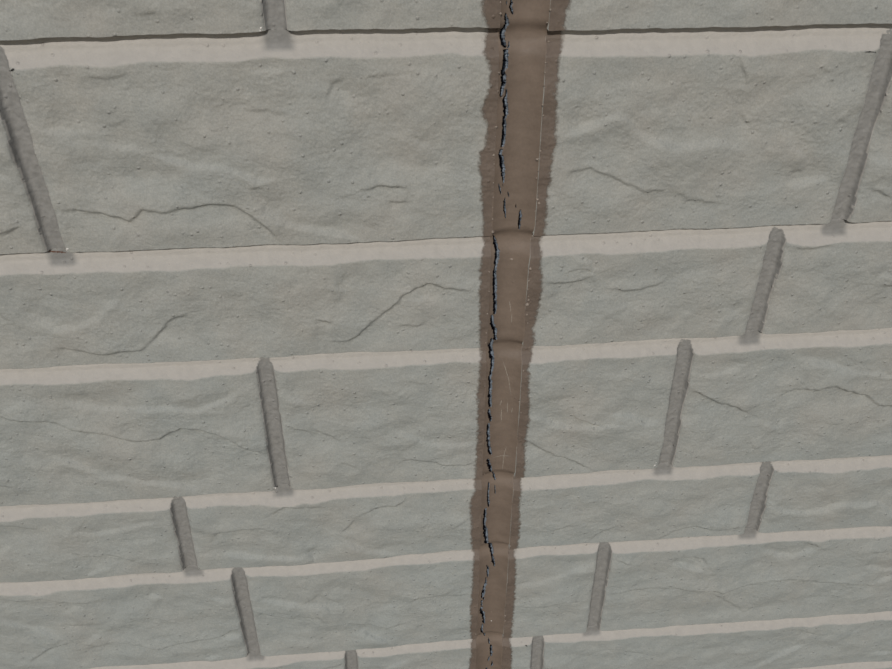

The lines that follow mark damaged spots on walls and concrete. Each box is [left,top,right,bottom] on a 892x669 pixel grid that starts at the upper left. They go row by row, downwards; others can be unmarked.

crack [498,0,522,229]
crack [479,235,500,669]